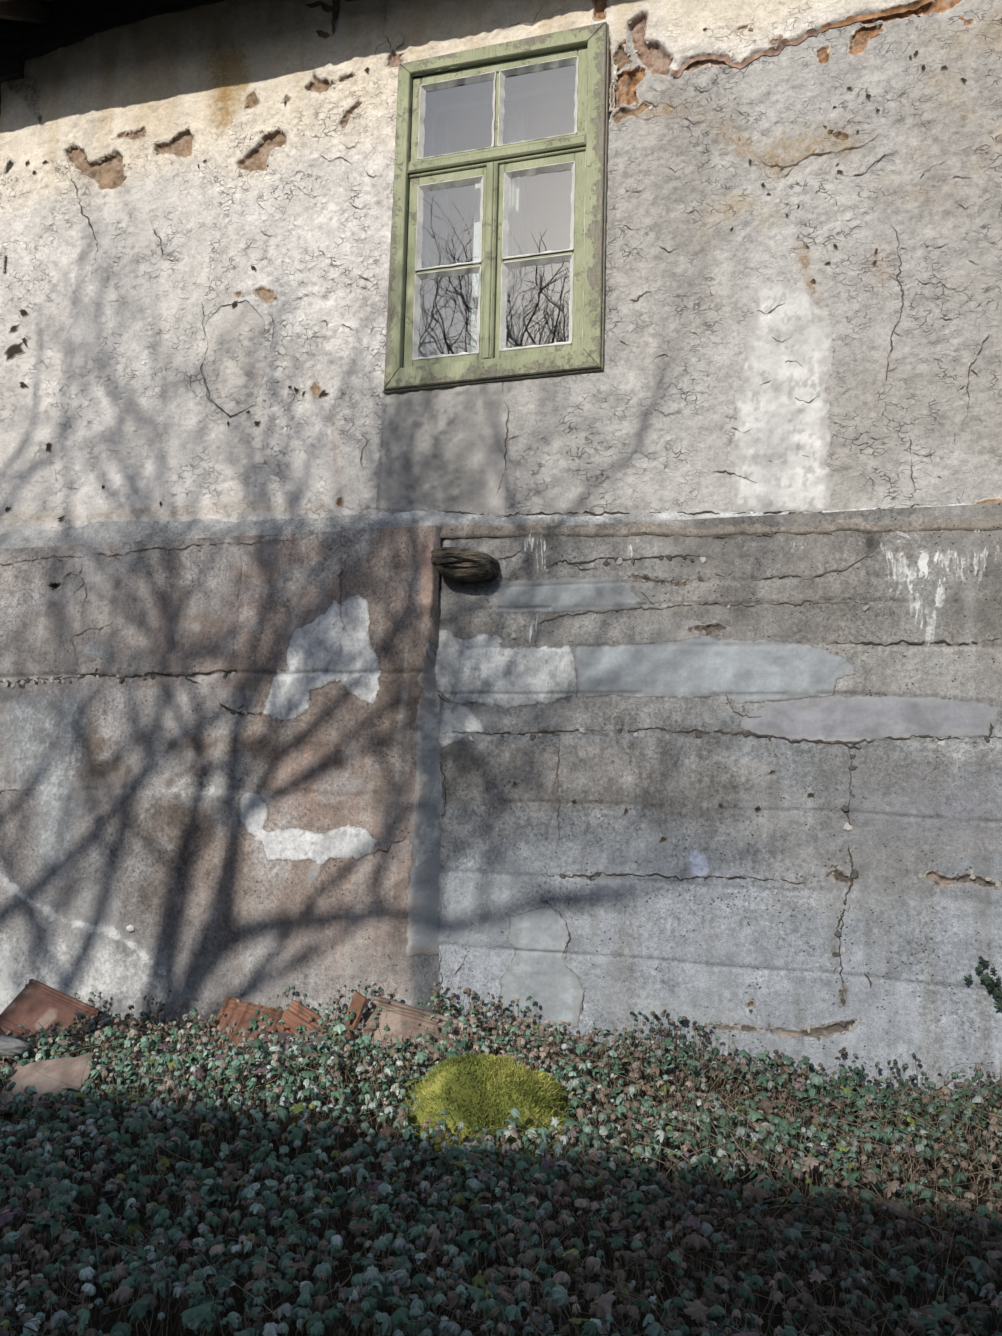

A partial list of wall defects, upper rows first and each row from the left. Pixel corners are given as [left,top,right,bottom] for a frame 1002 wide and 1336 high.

flaking render [591,0,976,132]
flaking render [3,156,48,177]
flaking render [63,126,207,191]
flaking render [235,126,289,174]
crack [871,225,997,509]
crack [0,539,345,718]
peeling [262,594,381,720]
peeling [417,539,577,747]
damp [863,531,999,646]
peeling [238,791,377,865]
crack [438,694,1002,1027]
spalling [918,869,1002,889]